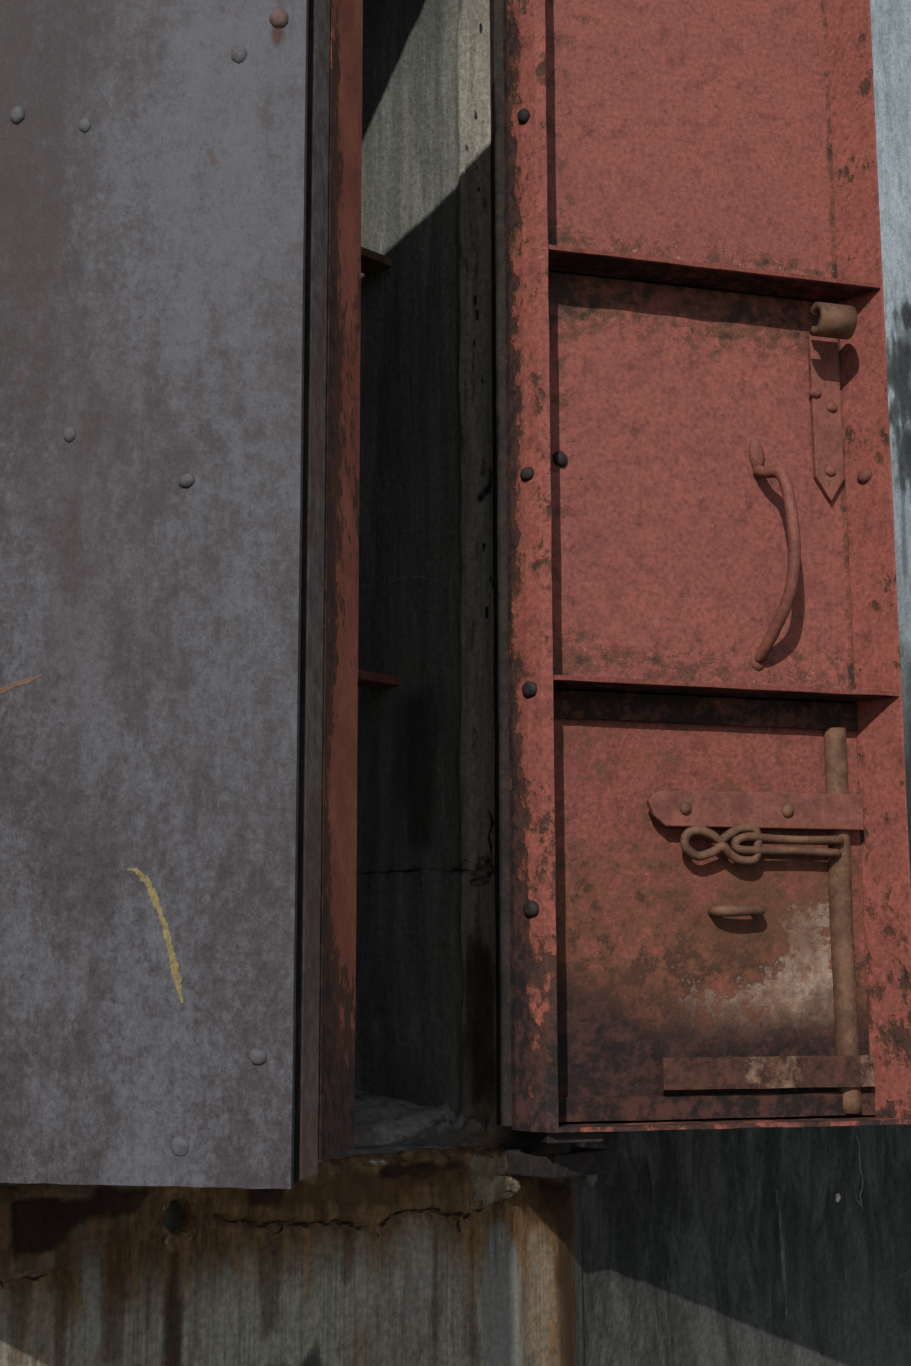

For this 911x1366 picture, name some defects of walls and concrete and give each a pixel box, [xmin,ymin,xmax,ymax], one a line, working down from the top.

leakage [886,302,911,489]
rust [11,1188,150,1253]
rust [216,1161,467,1215]
crack [213,1199,508,1240]
rust [165,1253,182,1366]